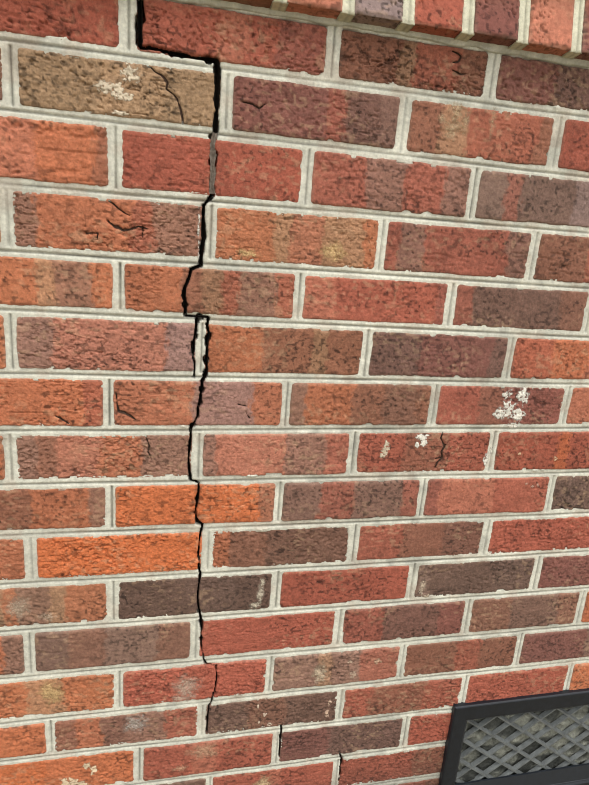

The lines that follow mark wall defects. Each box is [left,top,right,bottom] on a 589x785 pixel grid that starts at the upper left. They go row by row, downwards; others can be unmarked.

crack [137,0,221,731]
crack [435,433,448,467]
crack [276,725,284,756]